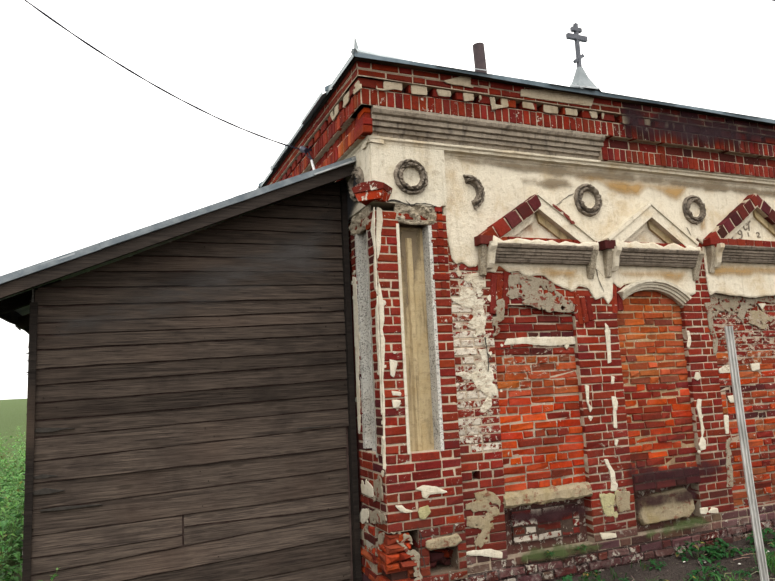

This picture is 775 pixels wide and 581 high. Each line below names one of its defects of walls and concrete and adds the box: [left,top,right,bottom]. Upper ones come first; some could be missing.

damp [607,182,643,193]
flaking render [434,206,576,443]
flaking render [710,303,775,373]
flaking render [416,485,447,498]
spalling [359,479,422,581]
flaking render [466,534,503,558]
spalling [429,549,451,568]